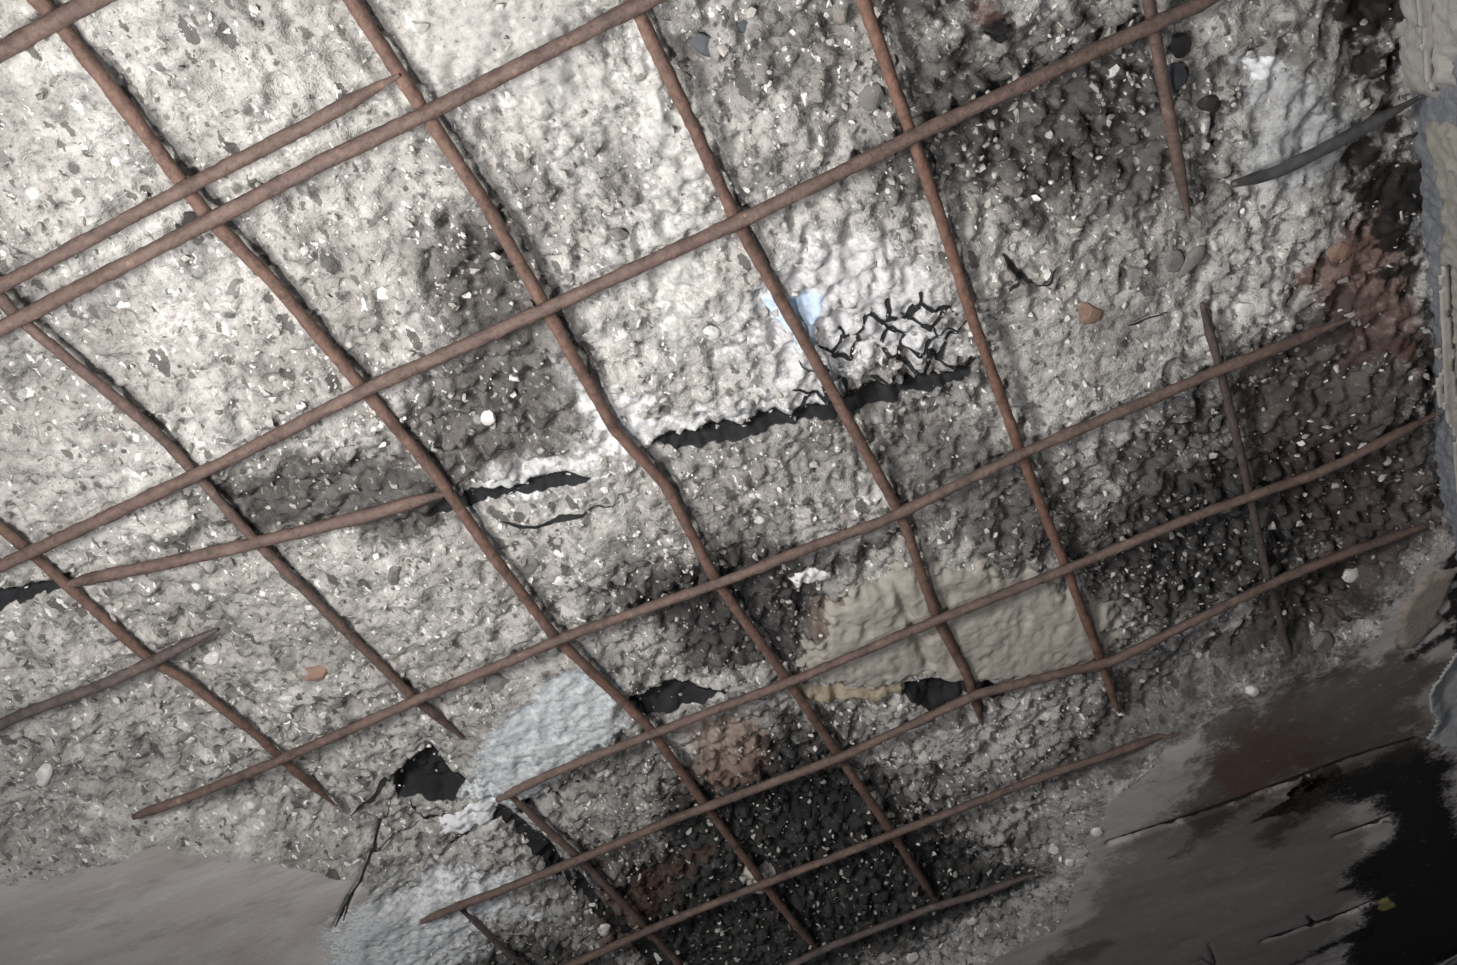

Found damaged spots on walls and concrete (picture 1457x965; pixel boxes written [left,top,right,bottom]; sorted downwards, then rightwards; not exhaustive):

leakage [1229,0,1423,298]
crack [422,471,620,529]
crack [652,292,974,450]
rust [1224,210,1447,663]
leakage [1384,348,1436,433]
efflorescence [461,668,626,808]
leakage [1178,551,1457,965]
leakage [581,709,1049,965]
spalling [803,883,838,931]
spalling [835,866,894,922]
peeling [1439,954,1457,965]